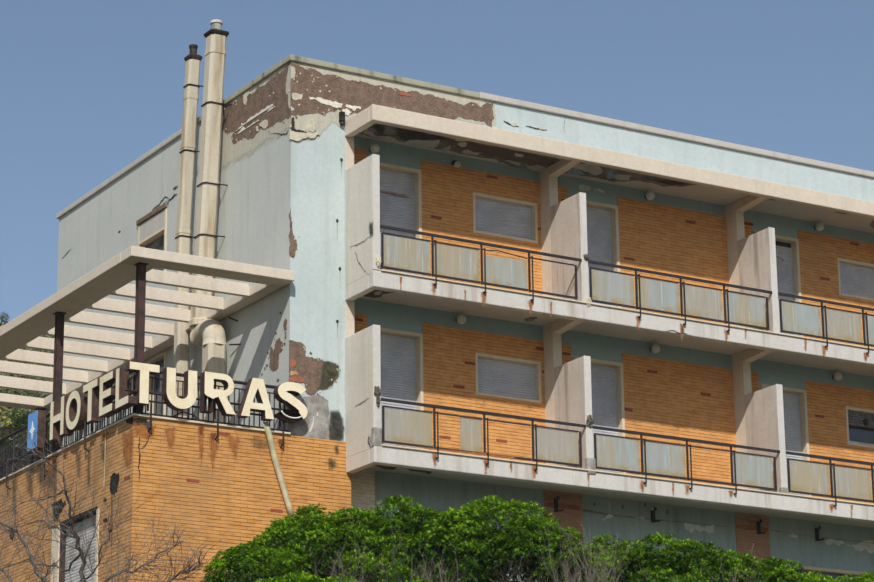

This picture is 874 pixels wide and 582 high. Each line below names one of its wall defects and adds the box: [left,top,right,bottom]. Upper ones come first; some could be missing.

spalling [221,61,495,168]
peeling [359,123,560,172]
peeling [565,162,696,193]
peeling [289,209,299,258]
corrosion [385,269,486,306]
spalling [261,312,341,440]